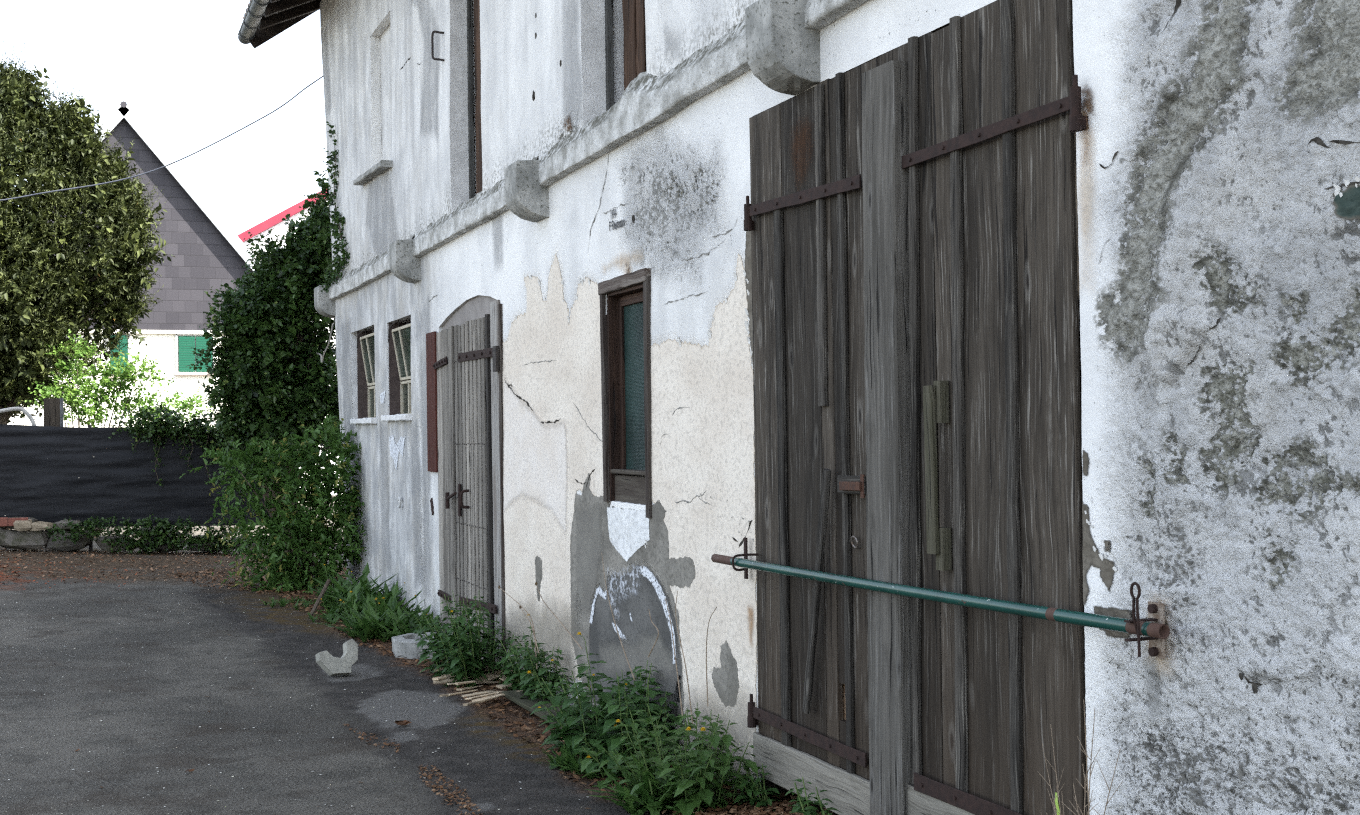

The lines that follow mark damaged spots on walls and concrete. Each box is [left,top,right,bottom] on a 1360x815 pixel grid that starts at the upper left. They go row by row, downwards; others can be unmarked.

corrosion [1081,88,1092,160]
crack [588,153,625,245]
crack [683,220,737,261]
peeling [1332,176,1360,220]
crack [504,360,601,487]
peeling [503,254,603,680]
peeling [651,254,757,790]
flaking render [1082,501,1136,638]
peeling [1126,494,1214,644]
peeling [1123,718,1360,815]